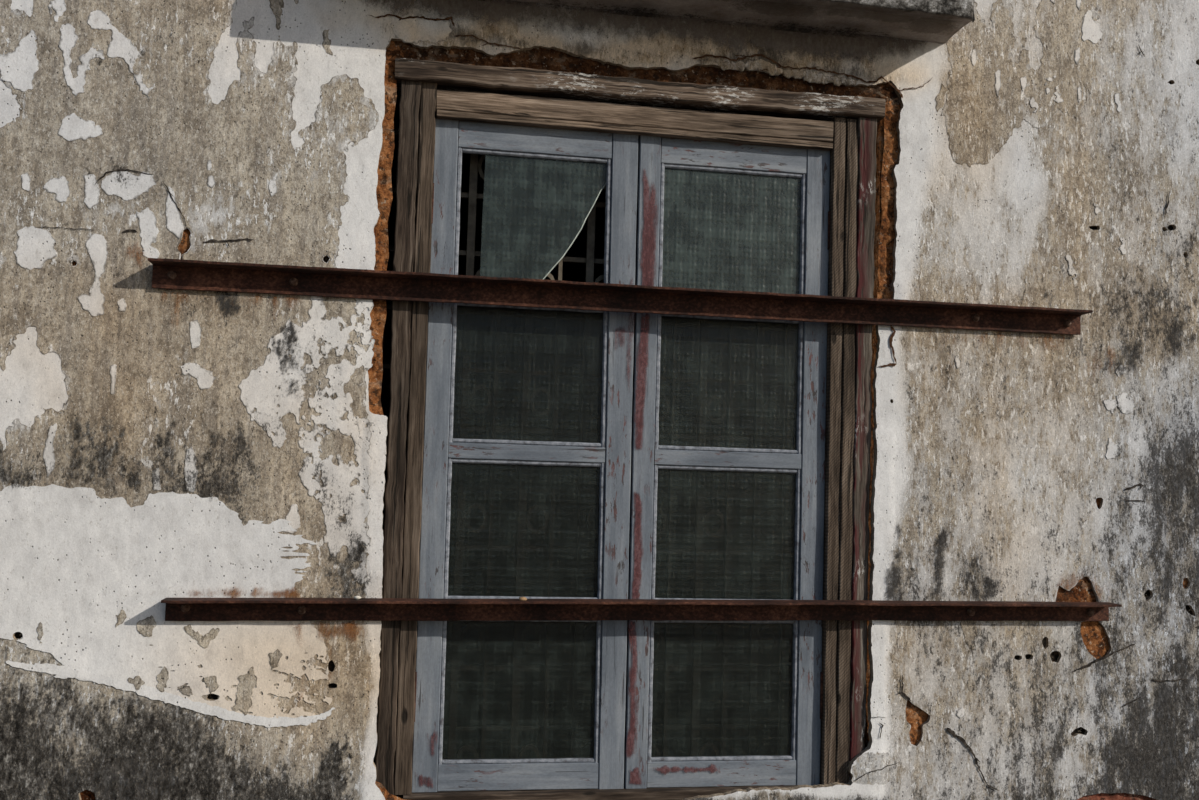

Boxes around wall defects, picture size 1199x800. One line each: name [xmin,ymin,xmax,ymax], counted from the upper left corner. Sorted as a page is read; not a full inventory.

crack [370,14,520,49]
crack [693,54,932,98]
peeling [935,0,1103,167]
peeling [0,0,901,599]
rust [273,589,298,598]
spalling [1056,577,1096,602]
peeling [115,610,156,637]
peeling [184,625,220,648]
peeling [128,666,219,700]
peeling [232,667,257,715]
damp [0,640,357,800]
spalling [906,700,928,745]